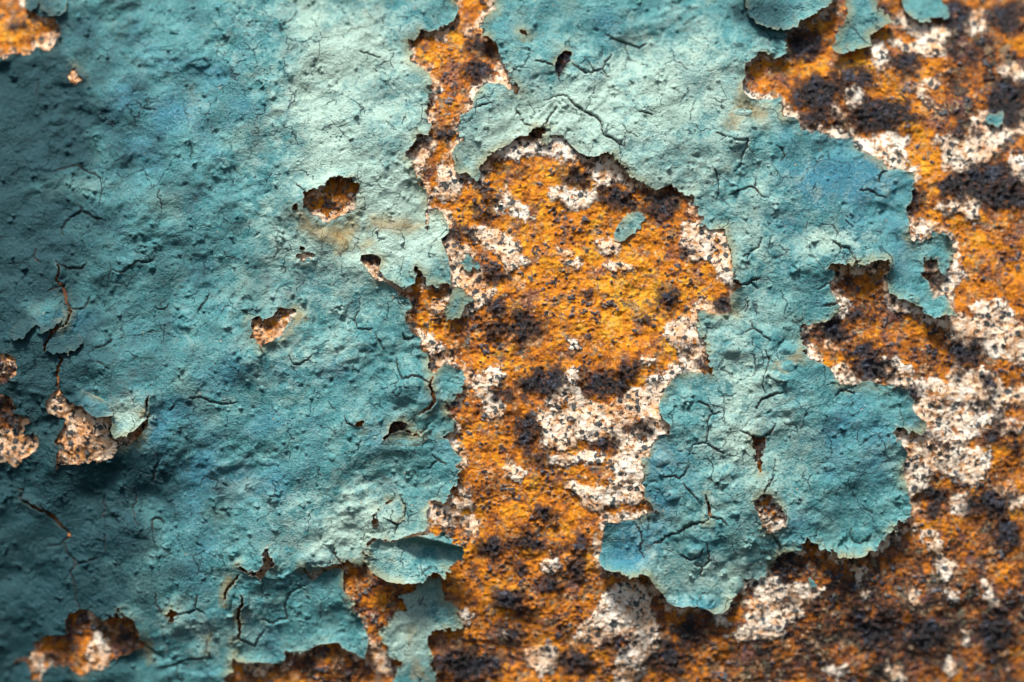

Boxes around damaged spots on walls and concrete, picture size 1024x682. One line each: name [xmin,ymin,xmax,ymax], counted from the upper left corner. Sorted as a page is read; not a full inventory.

peeling [0,0,68,59]
rust [786,24,927,135]
rust [935,157,1024,213]
peeling [46,388,149,471]
crack [347,311,446,468]
rust [483,362,633,456]
peeling [224,0,1024,682]
crack [740,238,787,439]
rust [810,305,899,384]
crack [636,401,728,576]
peeling [14,608,145,682]
crack [155,575,306,647]